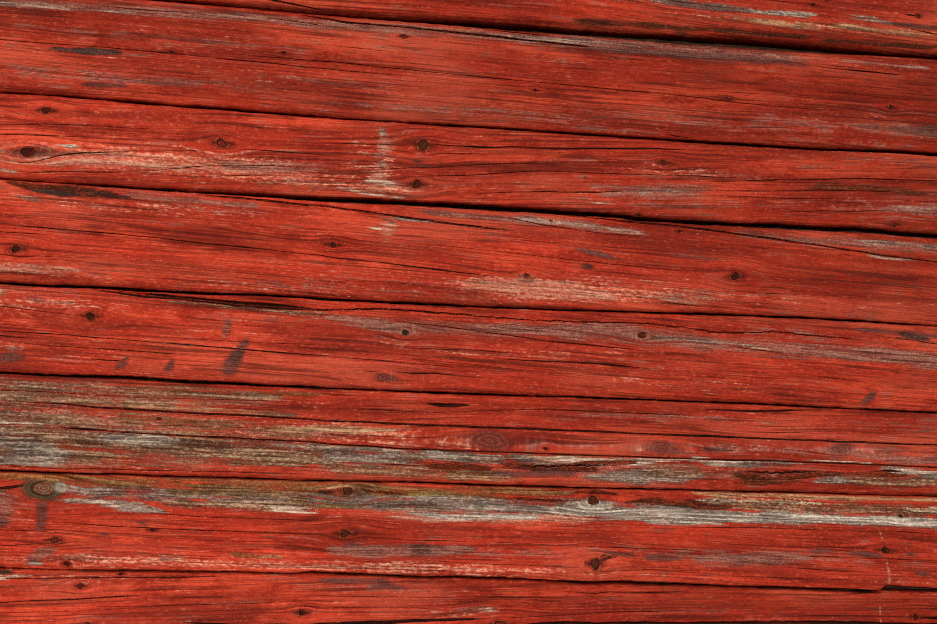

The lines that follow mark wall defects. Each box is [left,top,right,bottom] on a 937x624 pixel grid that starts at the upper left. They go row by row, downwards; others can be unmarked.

crack [0,124,147,173]
crack [148,134,937,287]
crack [0,224,494,286]
crack [0,289,935,375]
peeling [0,381,937,529]
crack [0,512,317,546]
crack [702,524,813,532]
crack [0,576,223,624]
crack [244,595,485,624]
crack [360,530,937,624]